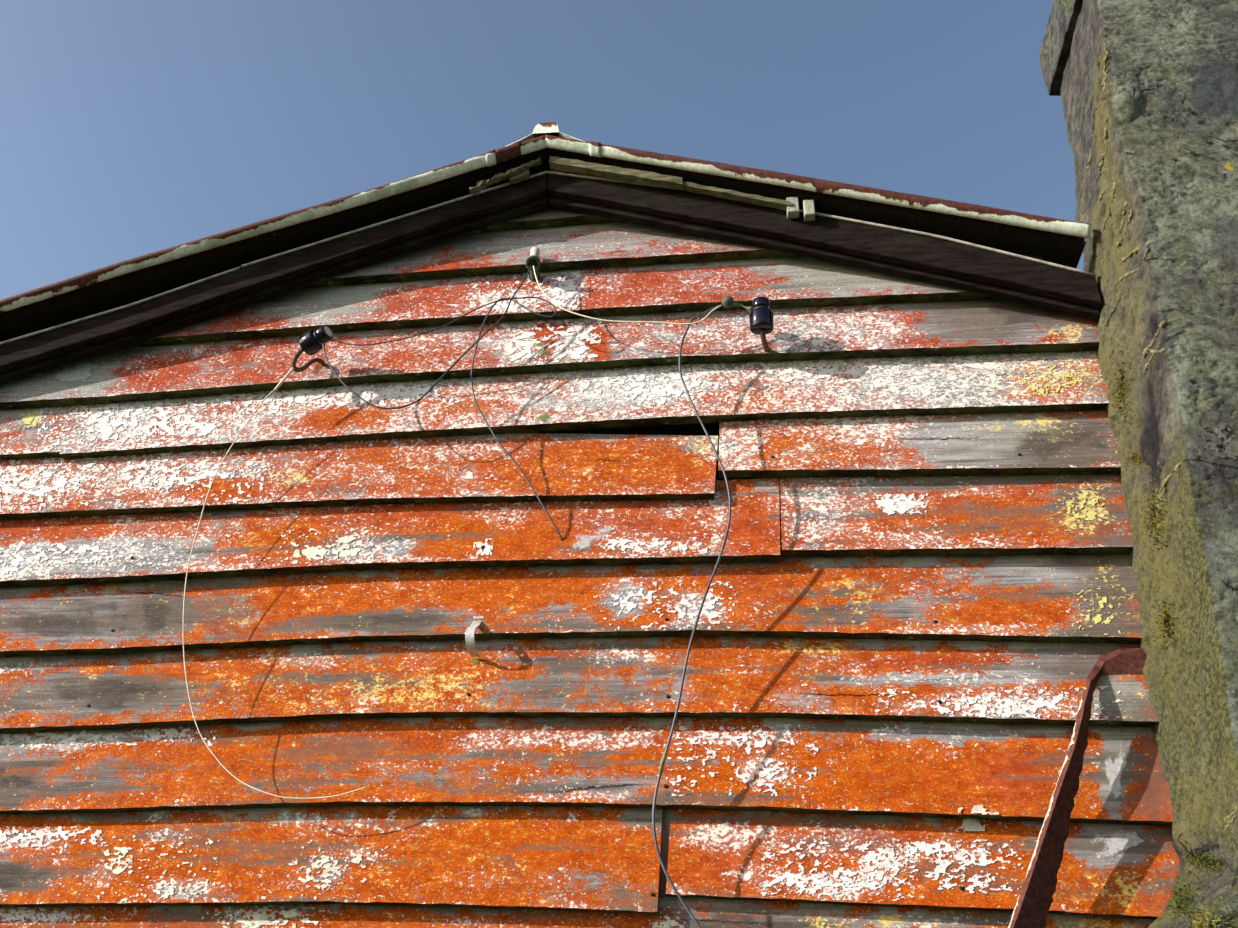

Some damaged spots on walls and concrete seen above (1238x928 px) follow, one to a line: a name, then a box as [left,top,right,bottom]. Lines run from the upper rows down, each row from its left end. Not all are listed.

peeling [466,269,933,412]
peeling [0,379,464,512]
peeling [278,527,377,566]
peeling [603,537,708,557]
peeling [876,493,928,515]
peeling [599,581,735,630]
peeling [874,686,1123,720]
peeling [666,724,818,796]
corrosion [1008,646,1147,928]
peeling [0,826,219,926]
peeling [202,840,392,928]
peeling [759,805,1024,901]